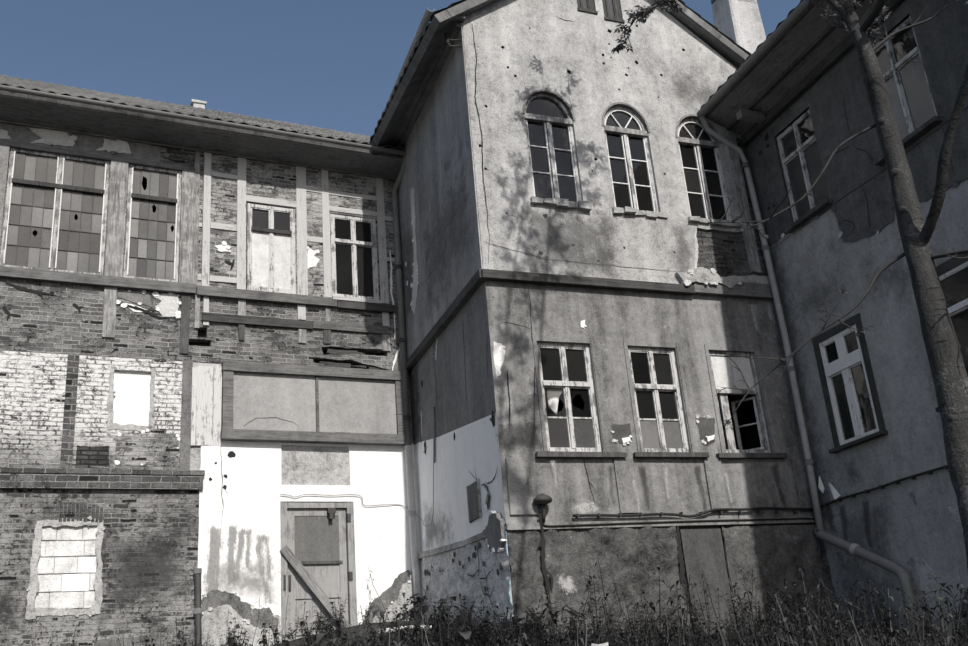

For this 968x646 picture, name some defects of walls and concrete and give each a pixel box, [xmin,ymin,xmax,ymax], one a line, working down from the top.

peeling [26,126,77,147]
peeling [97,138,132,155]
crack [415,26,666,291]
crack [771,99,887,249]
spalling [681,133,769,287]
peeling [405,188,419,315]
peeling [116,290,181,319]
spalling [493,341,506,377]
spalling [201,589,282,646]